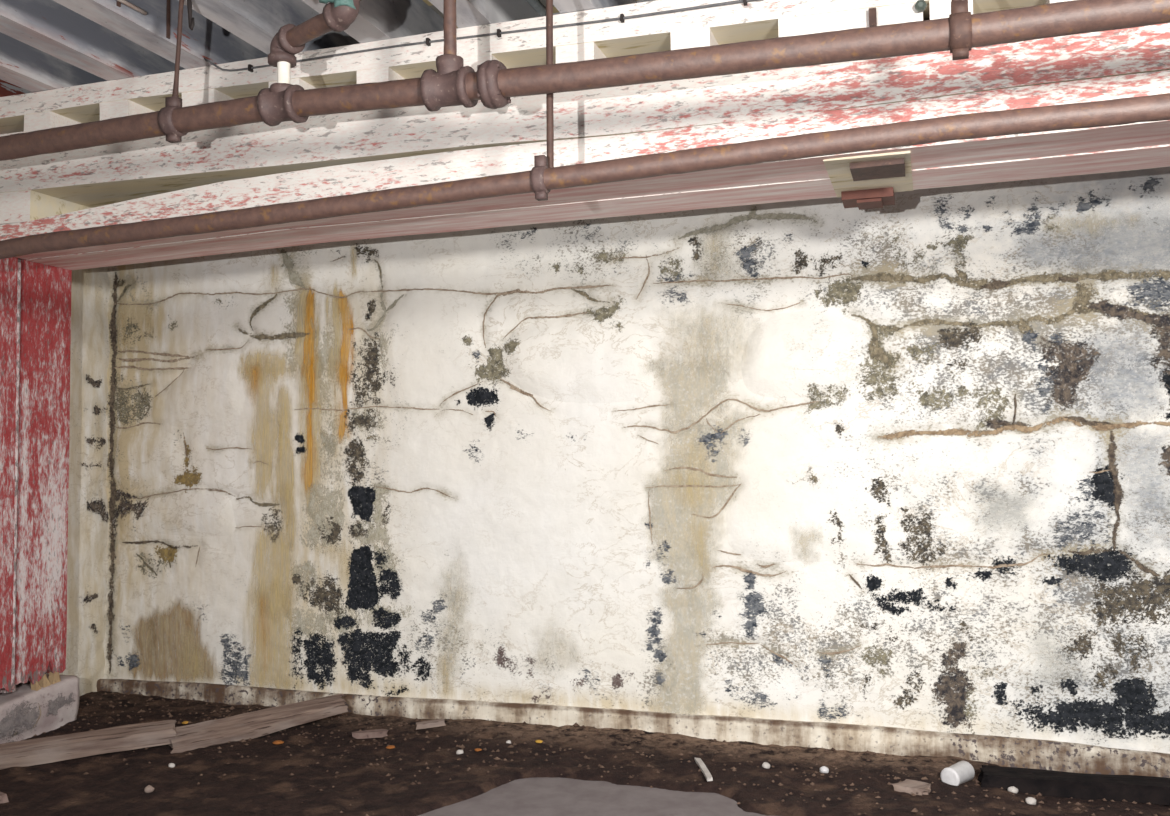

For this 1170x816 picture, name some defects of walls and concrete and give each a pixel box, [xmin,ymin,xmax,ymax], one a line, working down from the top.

leakage [649,234,864,313]
leakage [887,190,1170,311]
corrosion [241,287,354,547]
crack [106,207,1170,674]
leakage [807,320,988,413]
leakage [1022,325,1170,419]
leakage [288,332,461,696]
leakage [645,329,750,714]
leakage [828,511,844,544]
leakage [738,572,769,639]
leakage [858,437,1170,740]
leakage [817,699,859,720]